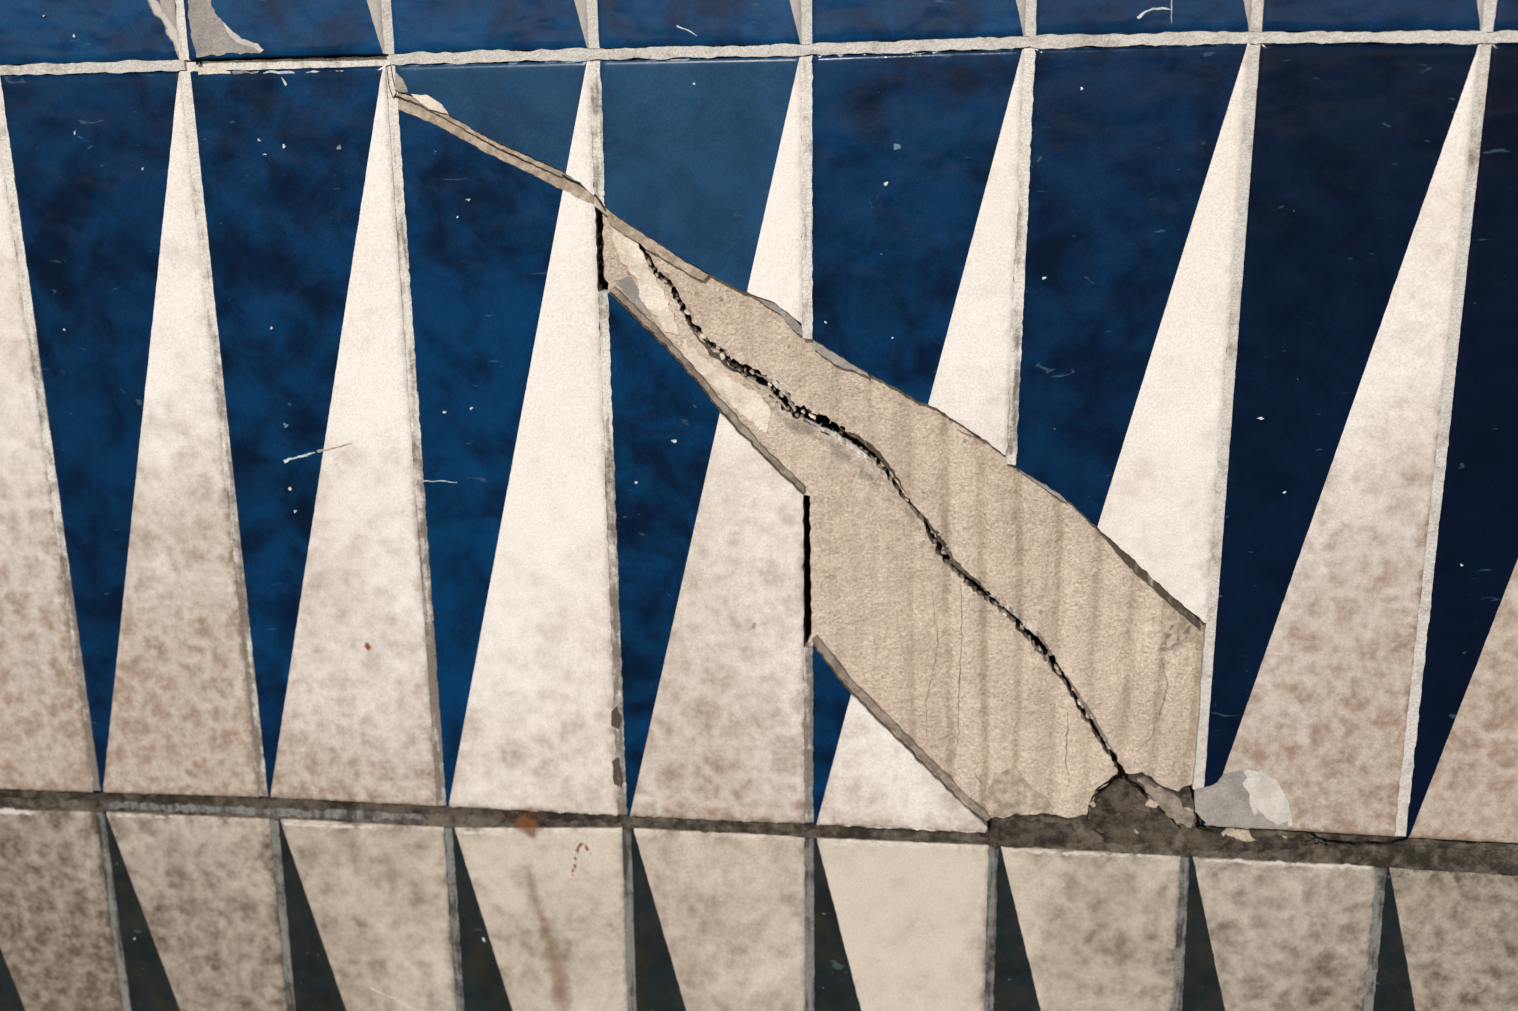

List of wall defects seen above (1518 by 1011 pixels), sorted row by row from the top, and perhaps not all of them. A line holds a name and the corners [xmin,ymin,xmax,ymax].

crack [386,66,1220,836]
spalling [602,211,1371,869]
crack [1272,829,1518,845]